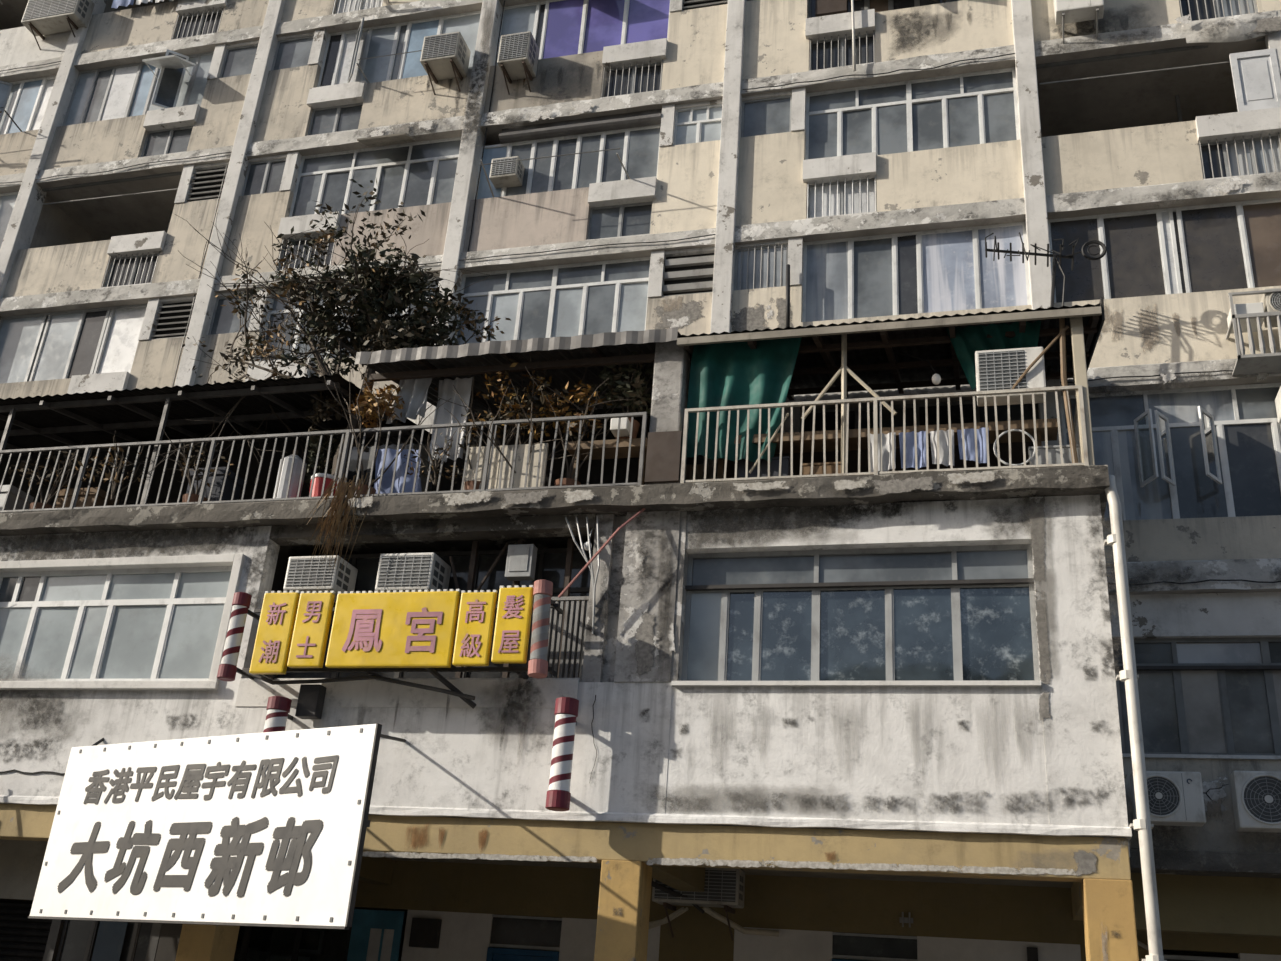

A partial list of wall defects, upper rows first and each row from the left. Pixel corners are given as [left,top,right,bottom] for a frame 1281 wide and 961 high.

leakage [895,12,953,47]
leakage [1089,496,1123,534]
leakage [0,527,272,609]
leakage [1098,549,1152,592]
leakage [1084,639,1120,679]
leakage [0,675,61,761]
leakage [664,791,848,811]
leakage [867,796,910,810]
leakage [934,792,985,812]
leakage [1005,789,1103,811]